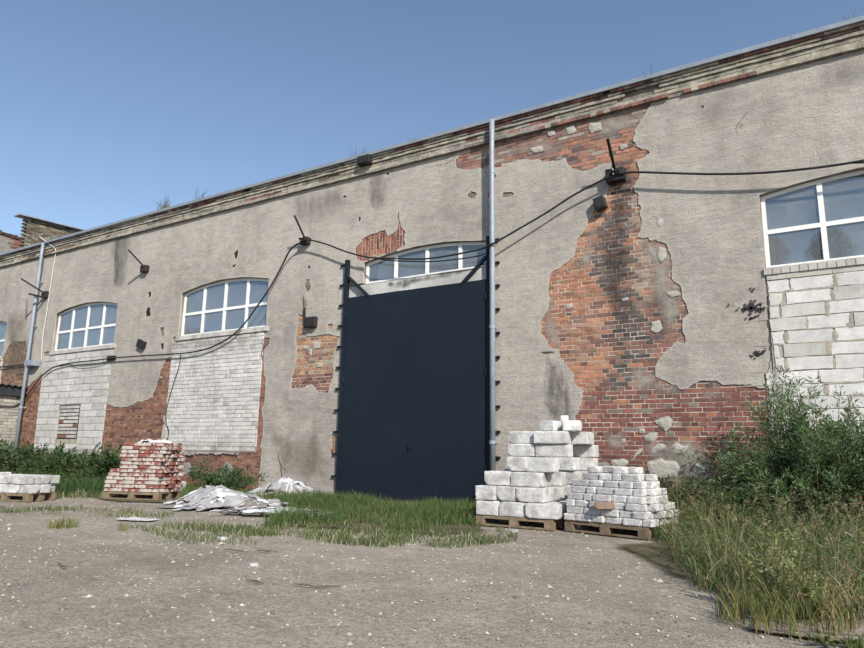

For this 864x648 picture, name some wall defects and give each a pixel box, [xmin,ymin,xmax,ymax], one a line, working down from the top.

flaking render [1,341,56,460]
flaking render [70,327,172,478]
flaking render [180,336,270,490]
flaking render [291,314,340,393]
flaking render [356,222,405,261]
flaking render [456,104,772,508]